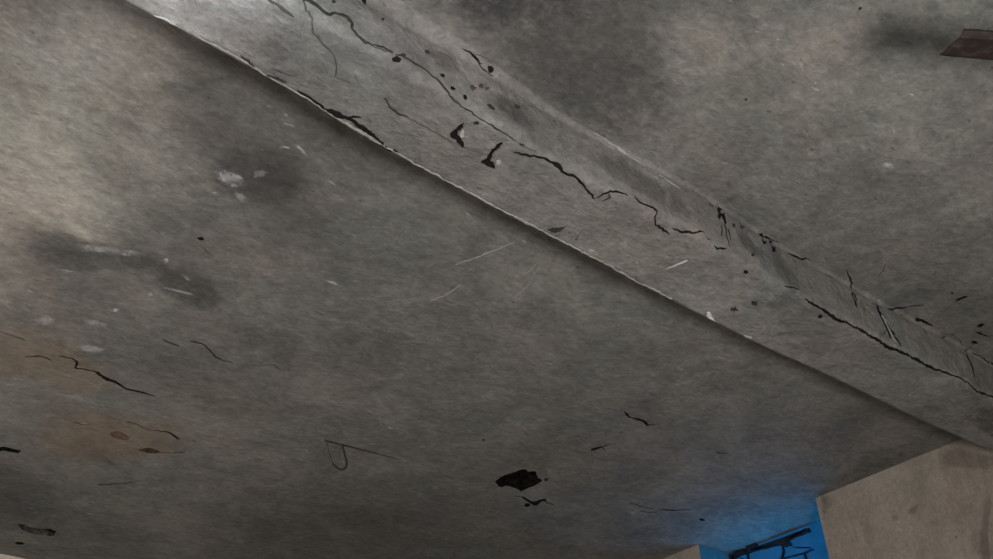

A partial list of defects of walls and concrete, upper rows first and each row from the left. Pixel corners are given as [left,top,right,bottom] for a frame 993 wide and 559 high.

crack [240,55,398,153]
peeling [154,15,672,299]
crack [268,0,731,250]
crack [0,331,155,397]
crack [162,339,280,369]
crack [784,253,993,398]
crack [126,421,196,442]
crack [608,408,657,426]
spalling [495,469,553,507]
crack [631,503,705,521]